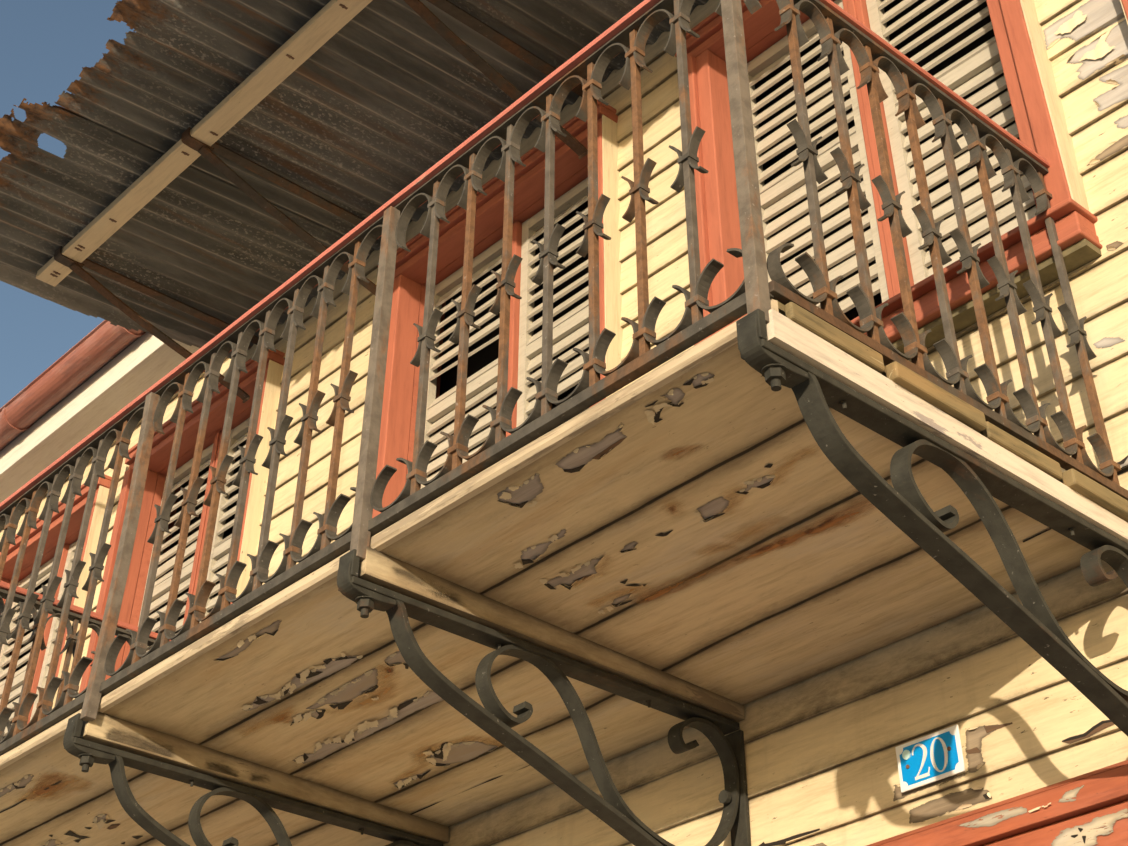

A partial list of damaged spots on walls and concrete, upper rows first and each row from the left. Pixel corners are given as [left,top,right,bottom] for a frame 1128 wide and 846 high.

peeling [1043,0,1128,111]
peeling [1087,115,1128,166]
peeling [555,422,627,473]
peeling [497,473,544,508]
peeling [694,464,775,524]
rust [744,503,864,559]
peeling [242,651,409,726]
peeling [293,690,443,764]
peeling [394,741,499,790]
peeling [893,722,1084,828]
peeling [40,814,120,846]
peeling [1051,808,1128,846]